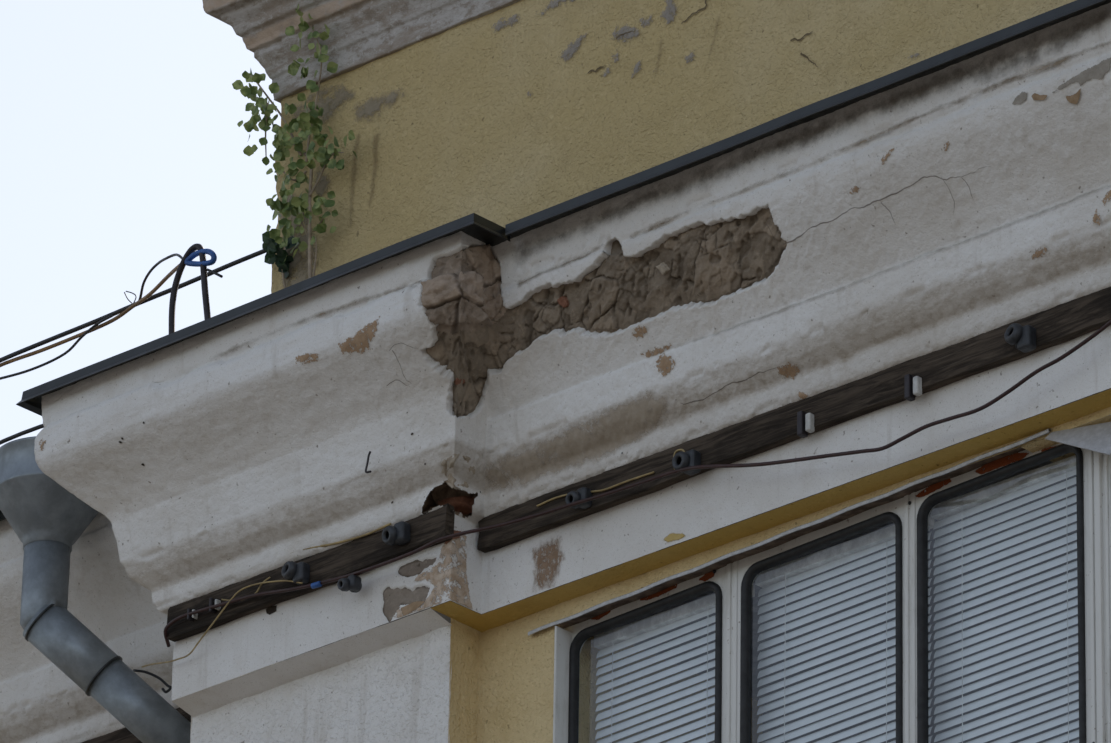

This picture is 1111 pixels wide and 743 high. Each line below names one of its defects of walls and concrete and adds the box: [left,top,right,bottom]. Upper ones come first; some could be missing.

peeling [1012,58,1111,105]
crack [766,166,990,245]
spalling [338,316,380,355]
spalling [421,207,787,417]
peeling [383,453,481,623]